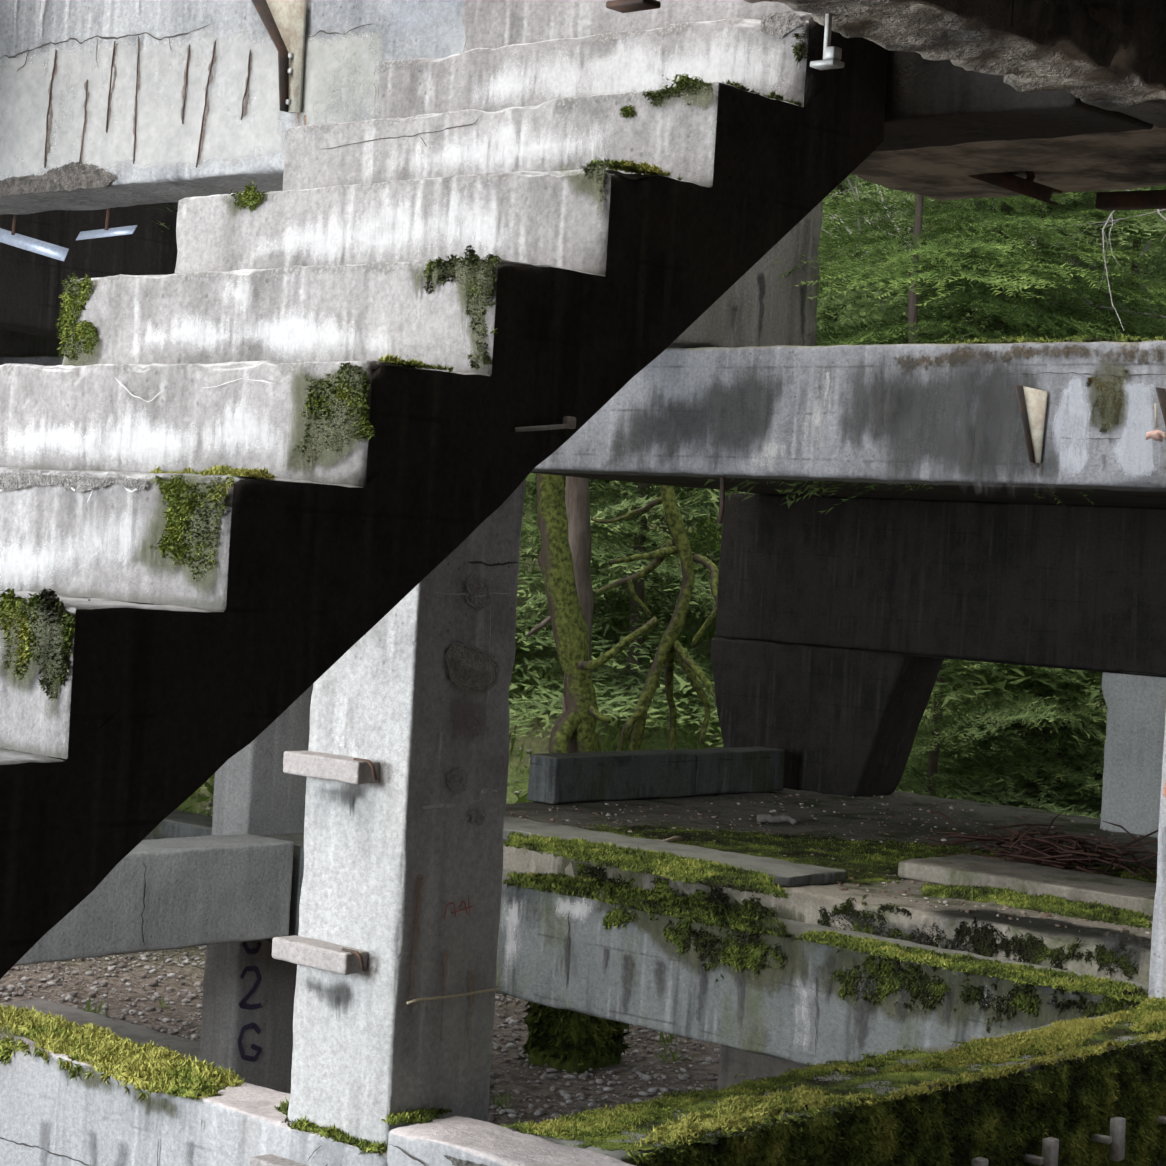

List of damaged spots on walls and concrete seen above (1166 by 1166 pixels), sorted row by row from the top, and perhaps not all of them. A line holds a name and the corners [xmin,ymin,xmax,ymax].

crack [1,24,210,71]
crack [309,24,371,37]
peeling [0,34,281,196]
water stain [612,369,781,463]
water stain [842,345,1165,484]
crack [139,862,147,945]
crack [0,1137,90,1166]
spalling [444,1155,486,1166]